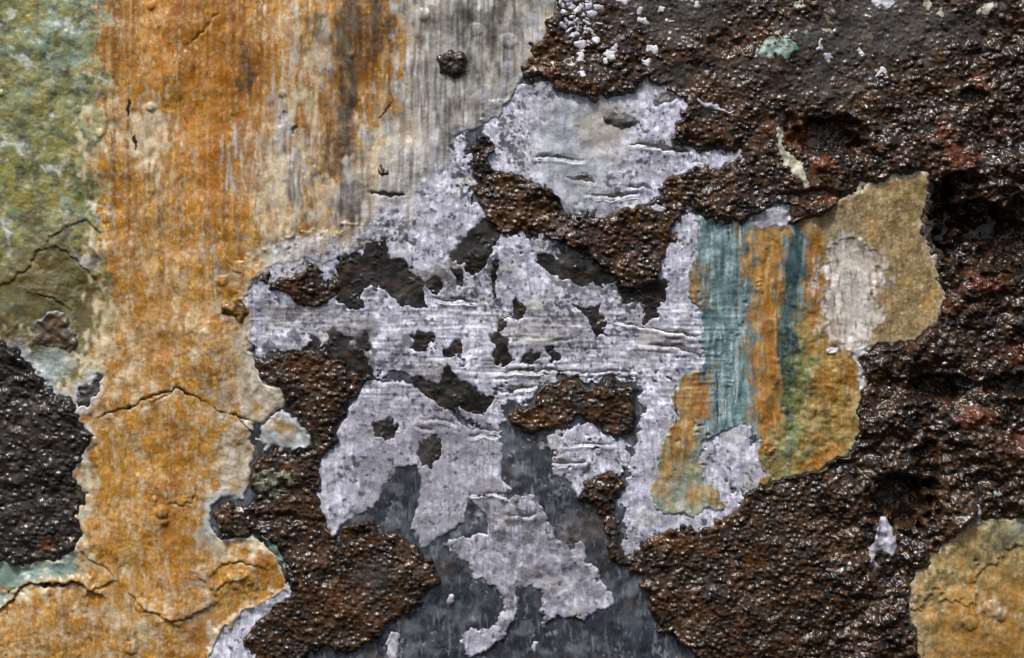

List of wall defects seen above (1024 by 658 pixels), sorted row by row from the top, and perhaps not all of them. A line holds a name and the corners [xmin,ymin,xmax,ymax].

peeling [556,0,618,79]
peeling [616,0,674,33]
peeling [482,45,745,217]
crack [89,386,252,432]
corrosion [0,0,441,658]
peeling [244,131,791,658]
corrosion [466,0,1024,658]
peeling [852,347,868,390]
crack [1,554,199,621]
peeling [209,582,291,658]